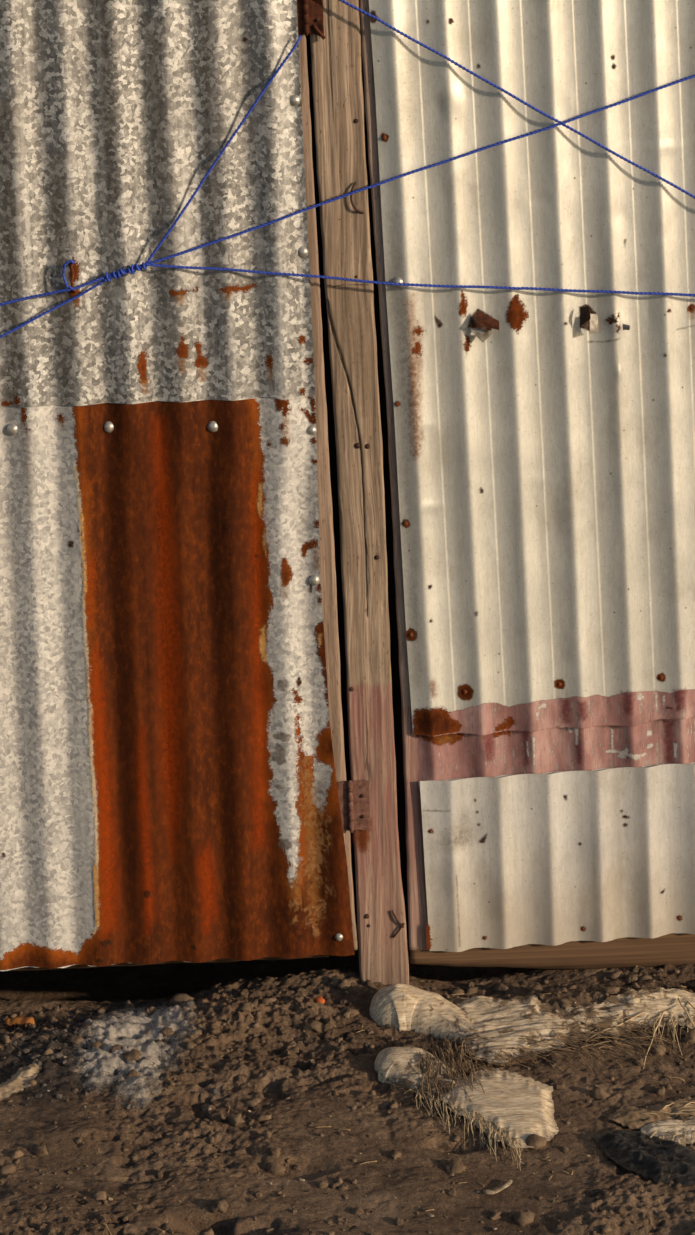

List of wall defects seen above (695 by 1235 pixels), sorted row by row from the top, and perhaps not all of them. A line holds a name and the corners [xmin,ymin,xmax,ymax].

rust [169,286,199,300]
rust [216,283,257,295]
rust [459,290,469,318]
rust [506,294,529,334]
rust [176,333,209,381]
rust [0,348,372,970]
rust [458,684,474,701]
rust [413,706,464,747]
rust [493,716,517,737]